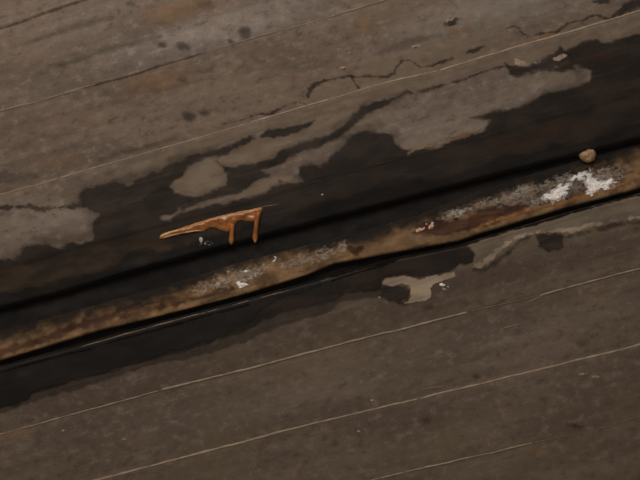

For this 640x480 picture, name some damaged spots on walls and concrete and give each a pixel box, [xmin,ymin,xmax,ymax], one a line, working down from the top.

water stain [0,0,640,295]
water stain [0,193,640,408]
peeling [383,272,455,304]
corrosion [413,166,630,235]